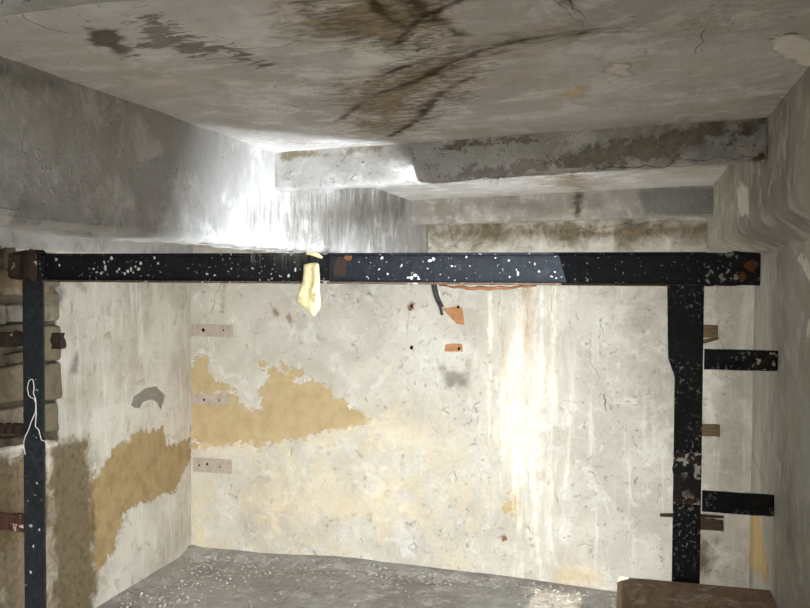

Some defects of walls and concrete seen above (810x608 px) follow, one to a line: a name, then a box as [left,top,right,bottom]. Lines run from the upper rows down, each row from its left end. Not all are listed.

water stain [88,5,276,69]
water stain [341,38,537,136]
spalling [428,135,551,153]
flaking render [738,181,749,219]
spalling [0,246,23,332]
spalling [0,347,23,424]
flaking render [0,435,24,513]
flaking render [44,282,372,608]
flaking render [750,515,770,583]